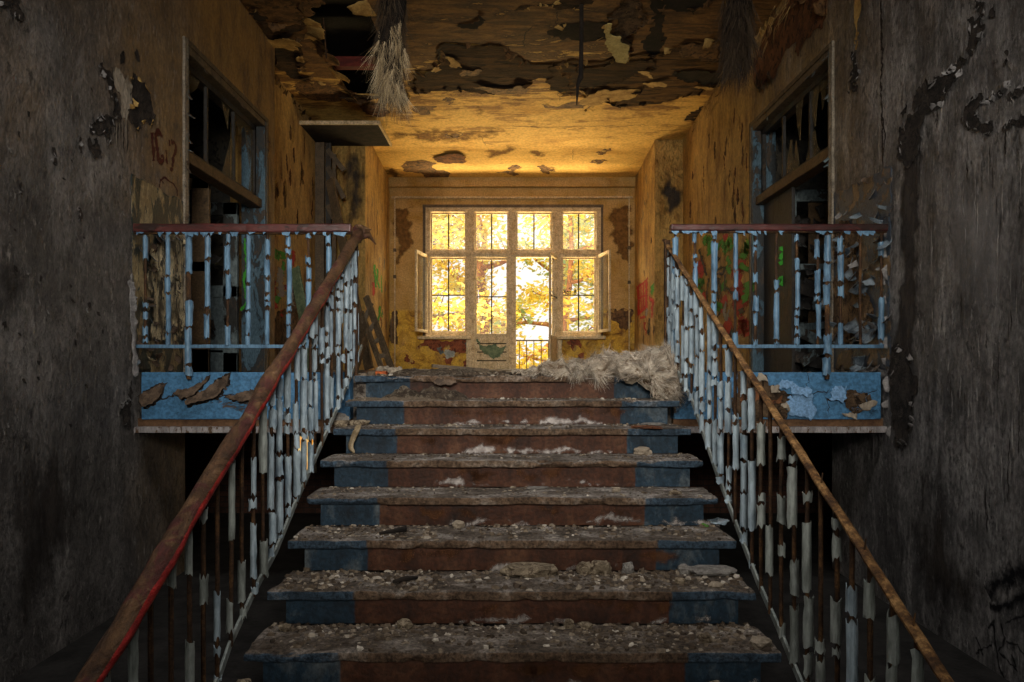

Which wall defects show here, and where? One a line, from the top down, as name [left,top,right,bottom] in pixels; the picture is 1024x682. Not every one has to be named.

peeling [401,0,747,237]
peeling [749,0,828,92]